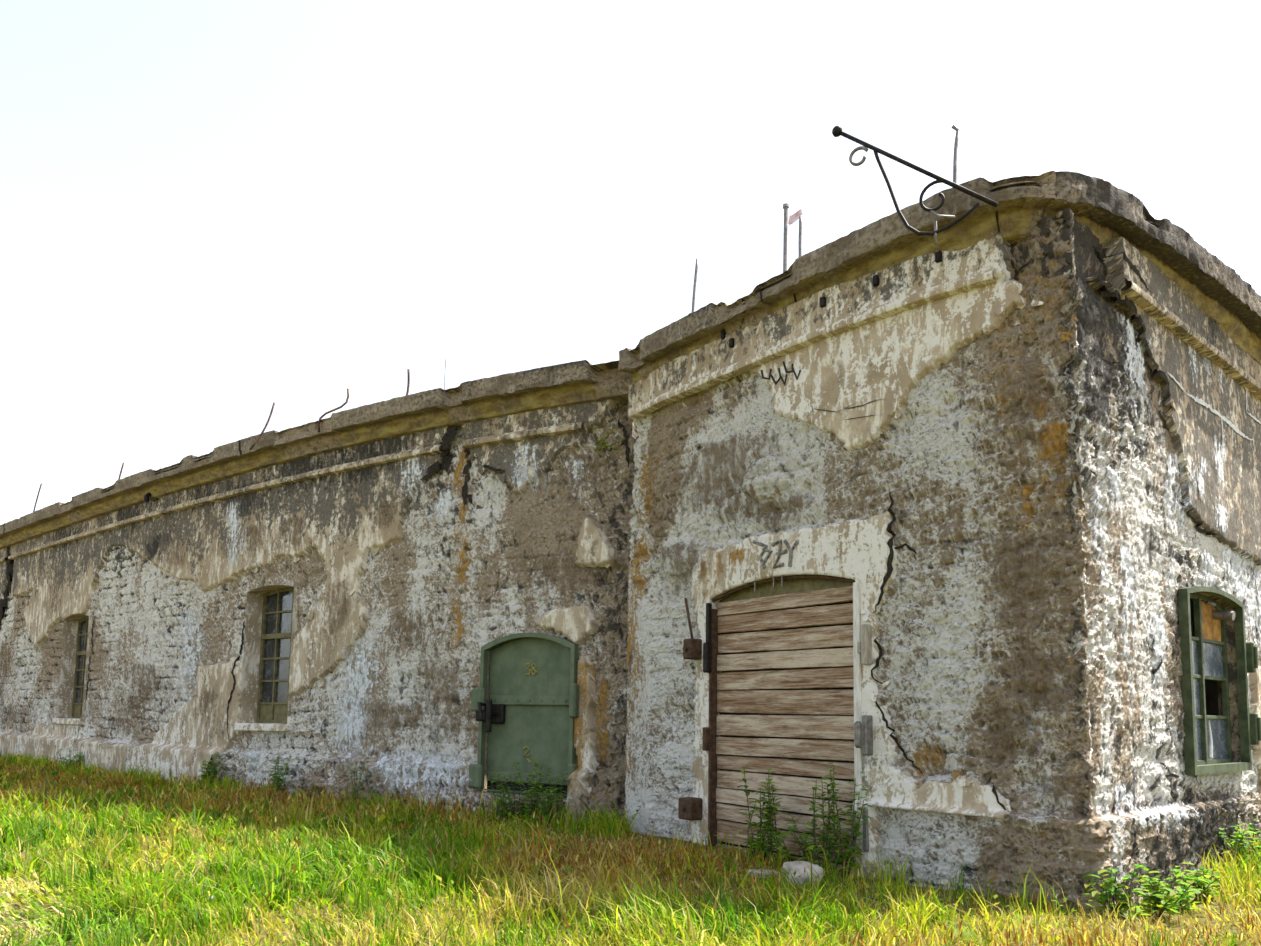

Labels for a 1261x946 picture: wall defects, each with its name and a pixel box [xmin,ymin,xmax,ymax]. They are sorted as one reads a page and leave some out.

crack [1088,245,1261,442]
spalling [0,576,68,736]
spalling [73,545,327,746]
spalling [212,171,1261,912]
water stain [988,528,1087,808]
water stain [1066,281,1229,710]
water stain [1198,548,1261,651]